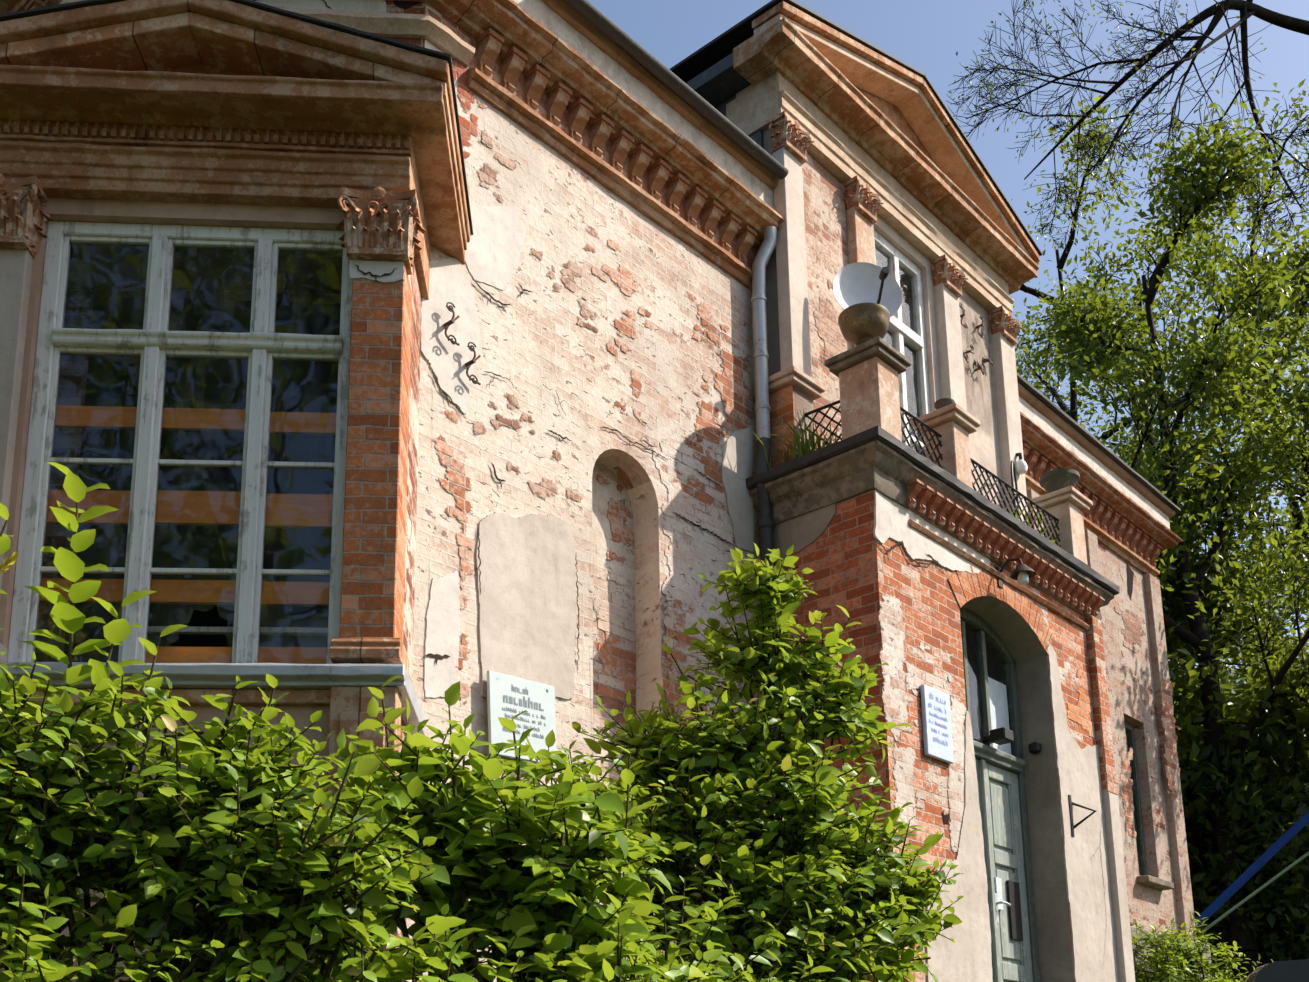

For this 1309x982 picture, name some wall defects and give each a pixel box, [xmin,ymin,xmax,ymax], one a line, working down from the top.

crack [473,280,533,312]
flaking render [530,240,653,359]
crack [432,369,466,419]
flaking render [441,393,535,435]
flaking render [434,435,473,610]
flaking render [507,461,583,501]
flaking render [613,303,752,728]
flaking render [593,474,636,707]
flaking render [455,633,471,707]
flaking render [1065,669,1095,738]
flaking render [1118,737,1137,837]
flaking render [1160,678,1182,805]